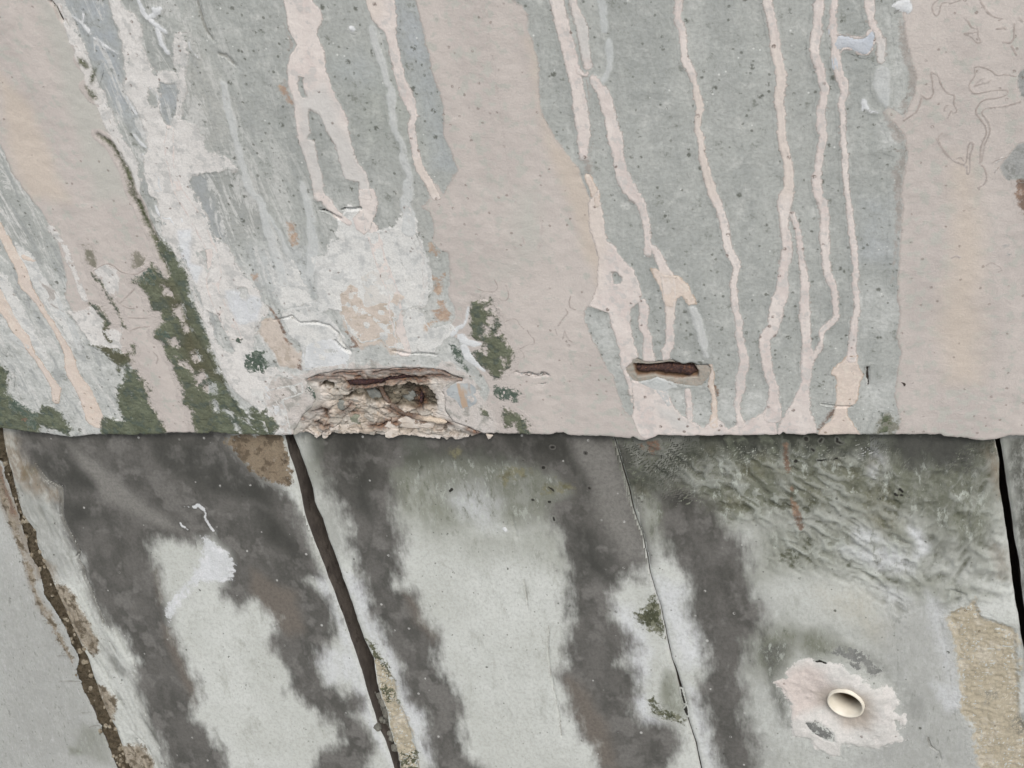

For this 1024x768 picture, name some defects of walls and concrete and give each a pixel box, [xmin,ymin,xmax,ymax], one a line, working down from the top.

spalling [293,367,493,440]
corrosion [348,374,447,424]
corrosion [636,362,723,399]
leakage [670,473,694,499]
leakage [678,471,711,494]
crack [34,461,105,626]
efflorescence [159,502,241,628]
peeling [824,642,891,684]
spalling [939,592,1024,768]
peeling [806,721,835,742]